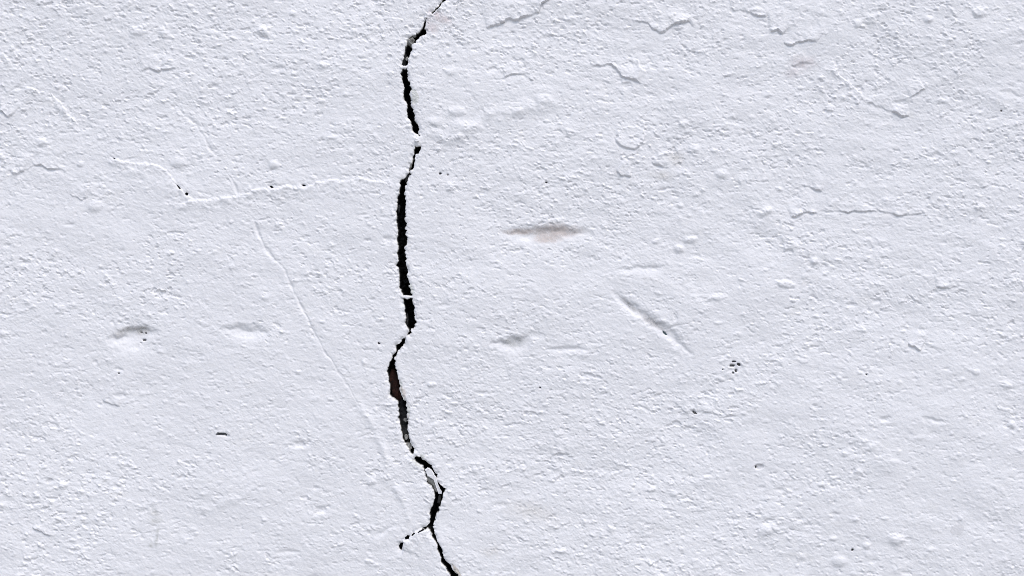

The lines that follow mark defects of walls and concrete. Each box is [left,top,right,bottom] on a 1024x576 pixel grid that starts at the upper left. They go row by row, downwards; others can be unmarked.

crack [111,0,462,576]